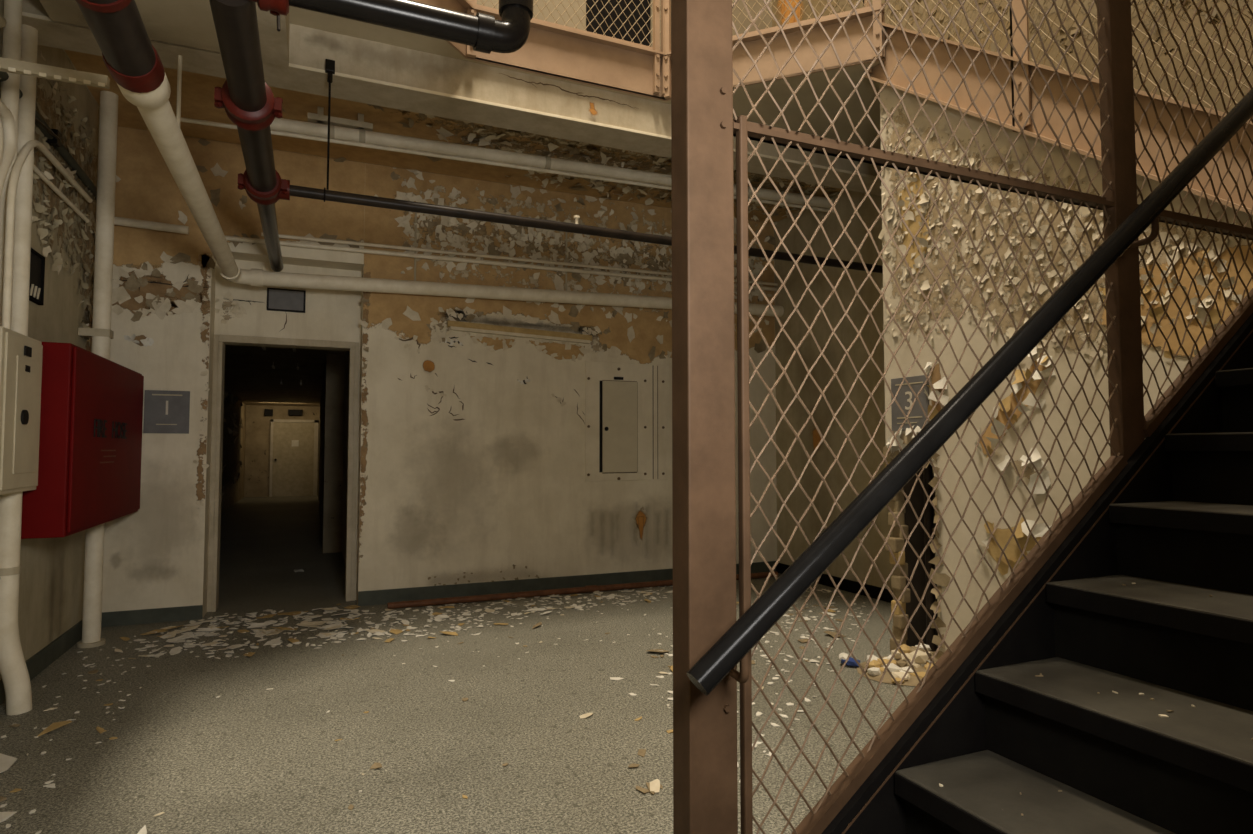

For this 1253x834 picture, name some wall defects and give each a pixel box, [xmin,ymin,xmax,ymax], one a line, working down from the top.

peeling [32,49,247,351]
peeling [164,67,672,558]
peeling [733,169,842,353]
peeling [883,362,949,467]
peeling [878,97,1104,345]
peeling [974,275,1107,494]
peeling [1138,207,1253,359]